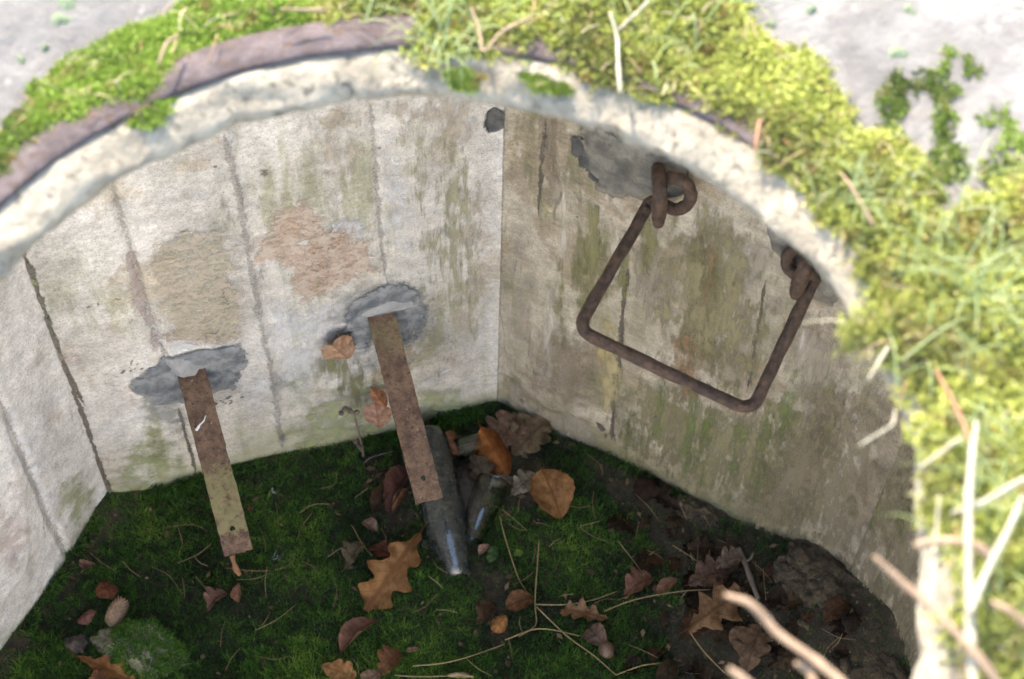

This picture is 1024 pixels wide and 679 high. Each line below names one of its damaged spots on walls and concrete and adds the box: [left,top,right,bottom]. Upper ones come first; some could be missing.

spalling [570,137,599,182]
leakage [543,188,589,352]
leakage [599,218,678,336]
corrosion [672,229,717,377]
corrosion [596,348,622,412]
leakage [728,370,920,677]